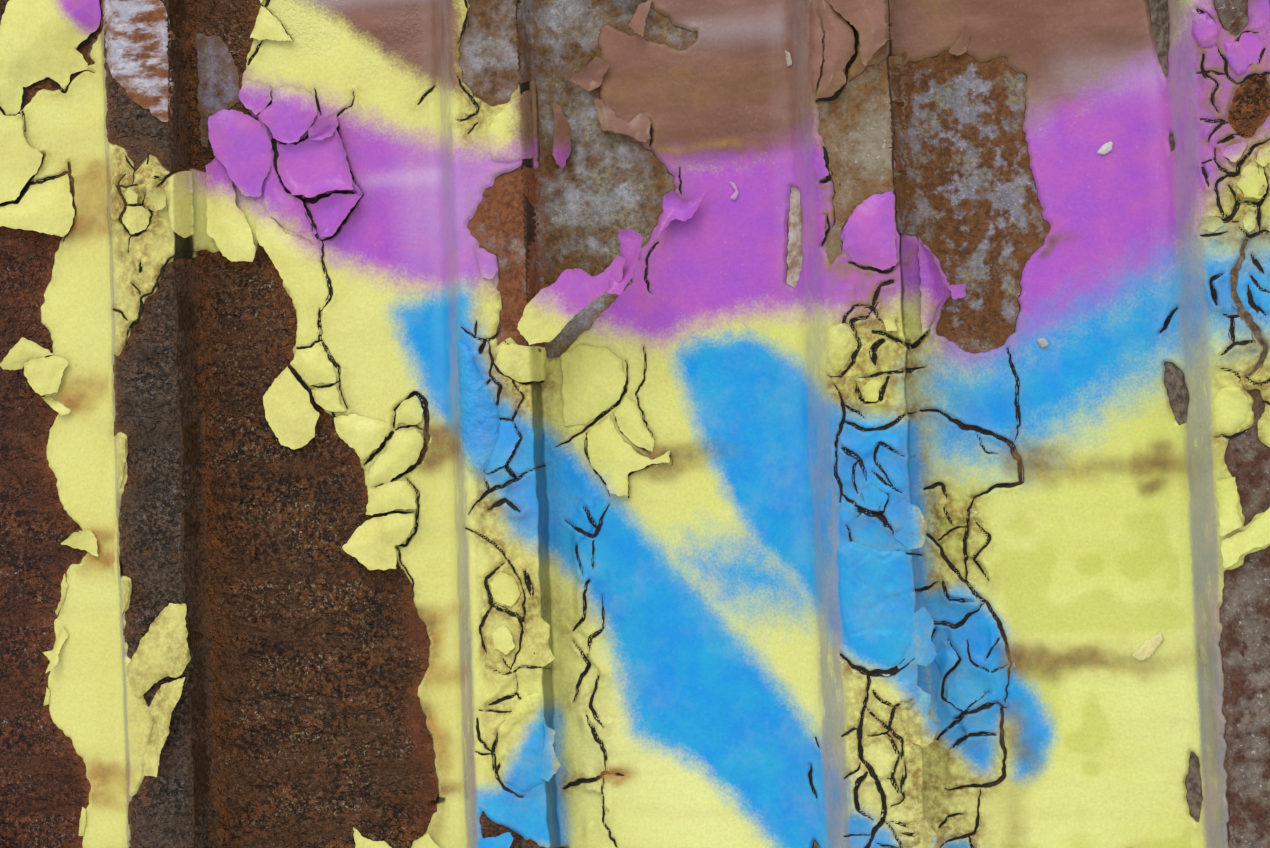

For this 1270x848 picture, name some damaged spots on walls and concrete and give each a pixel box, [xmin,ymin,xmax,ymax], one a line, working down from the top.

crack [0,28,98,241]
corrosion [90,533,115,566]
peeling [0,0,440,848]
crack [460,321,673,848]
peeling [452,0,707,496]
crack [819,146,832,183]
peeling [862,379,882,402]
crack [808,261,1024,848]
peeling [786,0,1050,354]
crack [1196,31,1270,405]
peeling [1214,0,1270,232]
peeling [1216,390,1270,848]